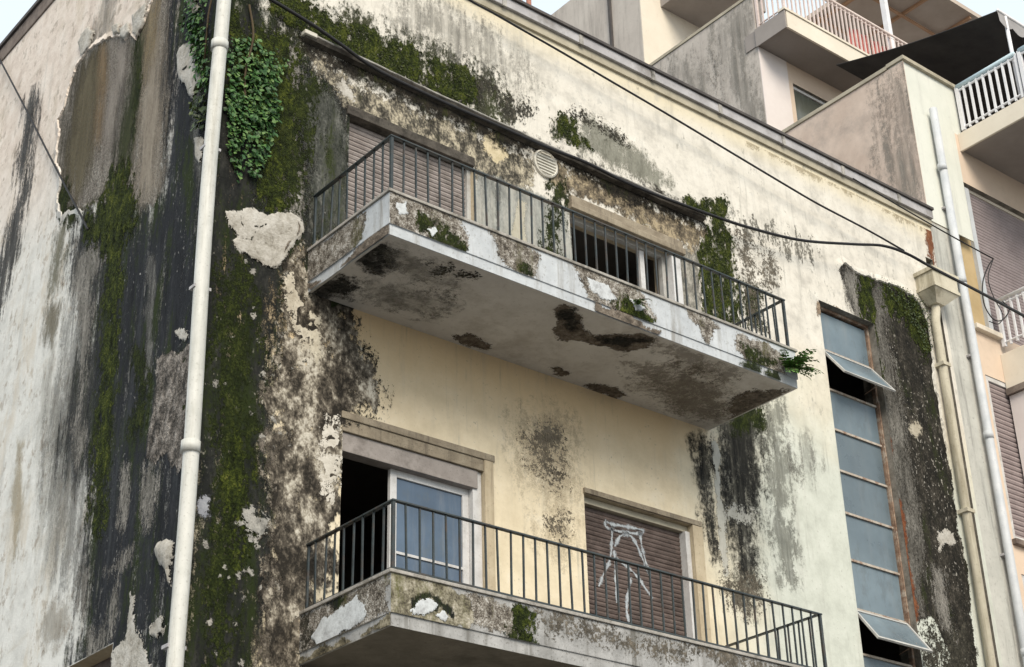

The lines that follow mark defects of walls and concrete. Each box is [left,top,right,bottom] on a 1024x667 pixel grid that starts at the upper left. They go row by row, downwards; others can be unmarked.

damp [0,84,42,314]
flaking render [53,0,172,262]
damp [72,462,161,656]
damp [144,256,156,386]
peeling [219,192,518,667]
damp [301,242,482,436]
damp [276,0,708,311]
damp [516,418,575,543]
damp [687,399,815,624]
corrosion [925,229,936,266]
damp [917,600,979,667]